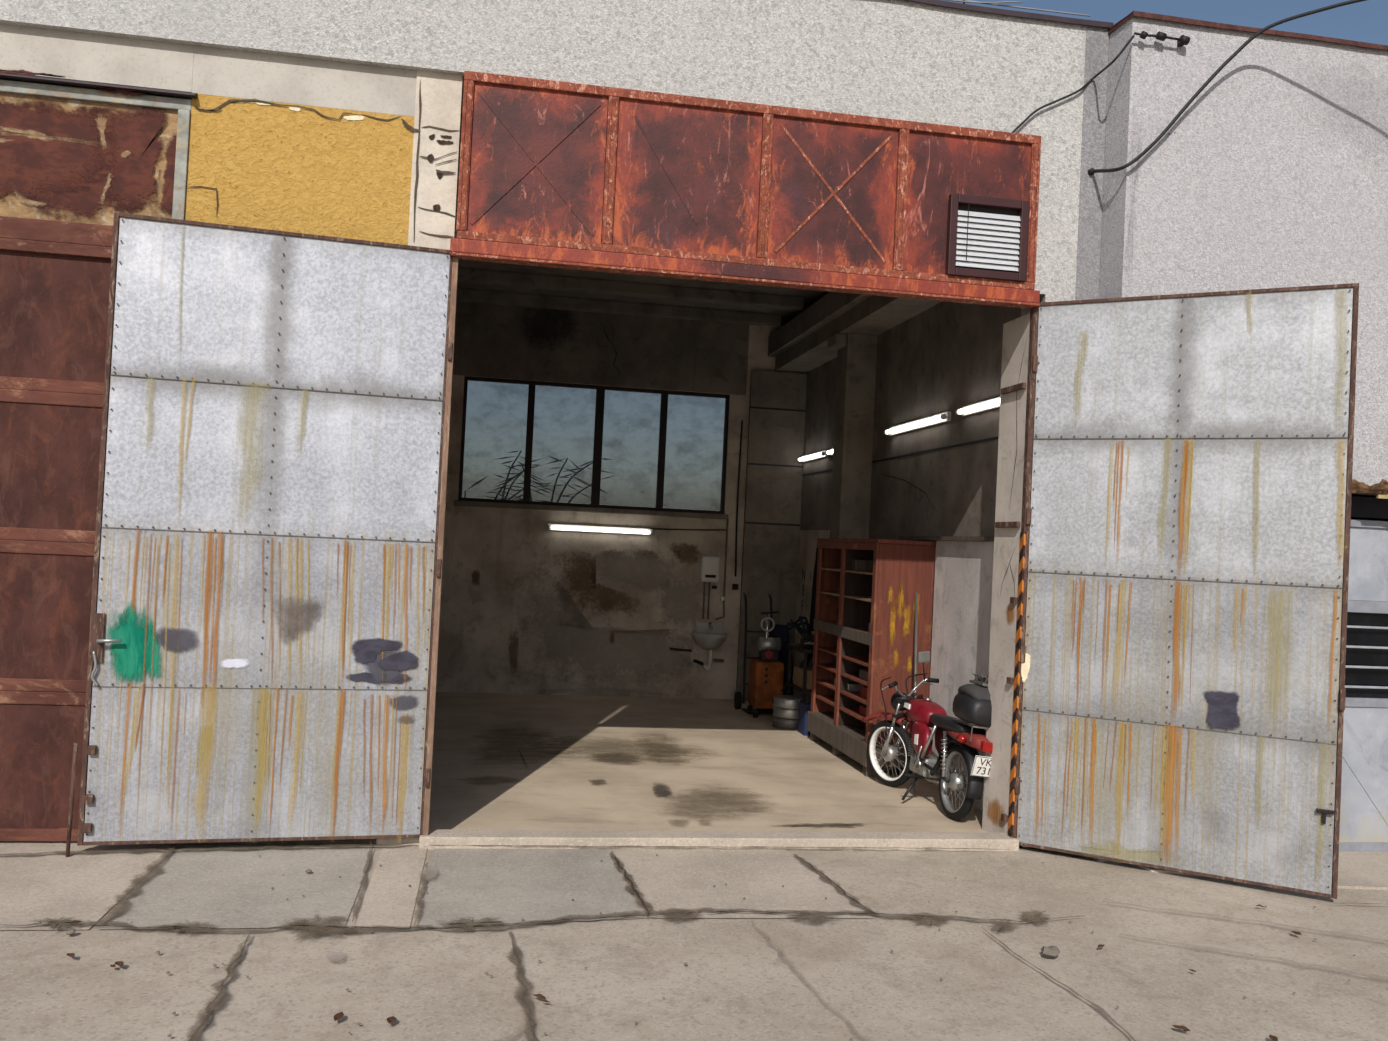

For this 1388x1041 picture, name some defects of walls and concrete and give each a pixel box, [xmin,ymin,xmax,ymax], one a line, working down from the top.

peeling [0,128,83,143]
peeling [96,119,106,145]
crack [190,89,460,238]
spalling [1352,479,1388,499]
corrosion [120,529,186,815]
corrosion [201,530,224,811]
corrosion [333,540,408,830]
corrosion [382,543,425,651]
corrosion [1072,579,1132,697]
corrosion [1173,581,1194,708]
corrosion [1062,718,1190,854]
crack [1,841,1136,1041]